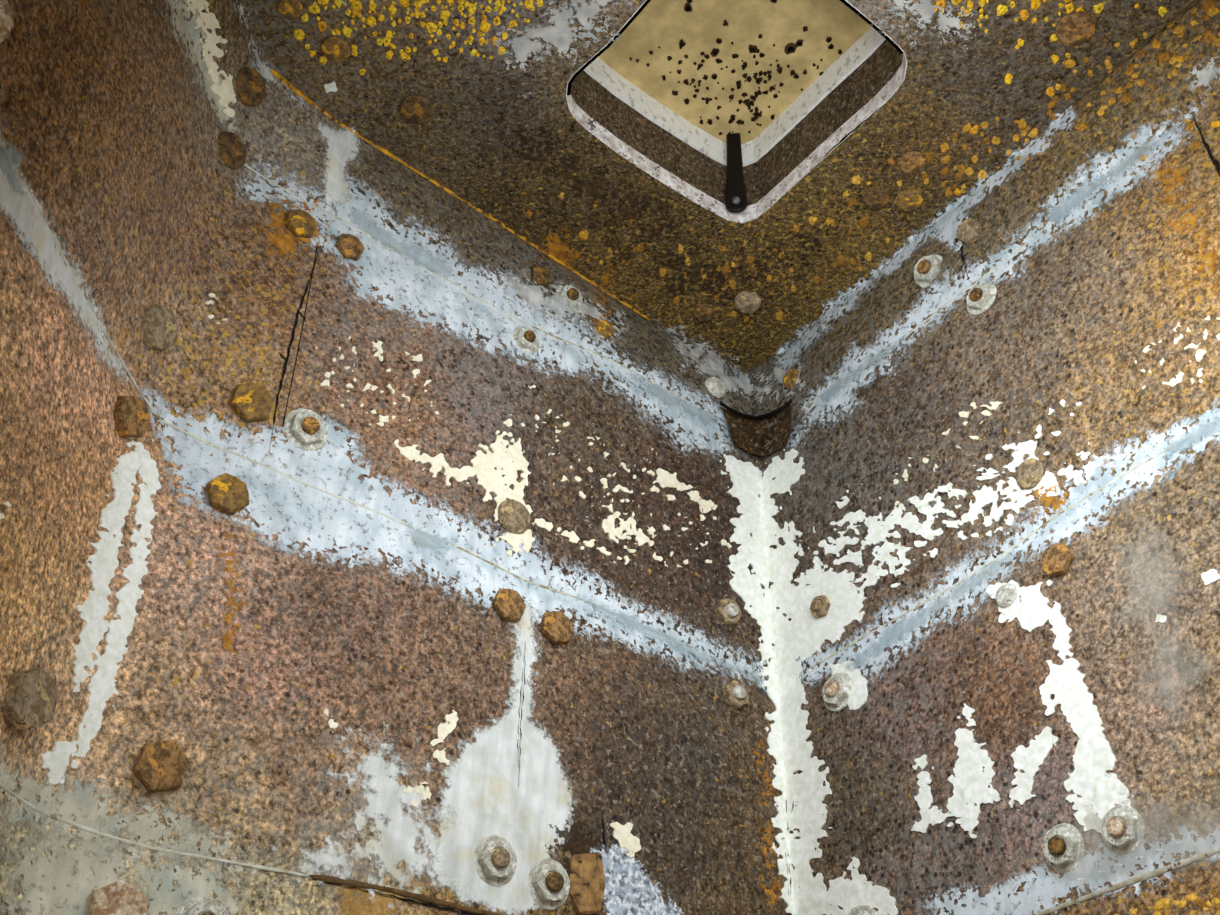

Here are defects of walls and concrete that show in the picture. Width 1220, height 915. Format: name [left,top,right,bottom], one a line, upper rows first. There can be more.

peeling [187,0,237,117]
rust [293,0,543,75]
rust [629,20,842,135]
rust [933,0,1220,132]
rust [459,82,902,345]
rust [917,116,1051,197]
crack [1192,116,1220,177]
crack [269,252,319,451]
peeling [320,336,439,427]
peeling [40,437,163,785]
peeling [393,393,1138,915]
crack [310,879,475,915]